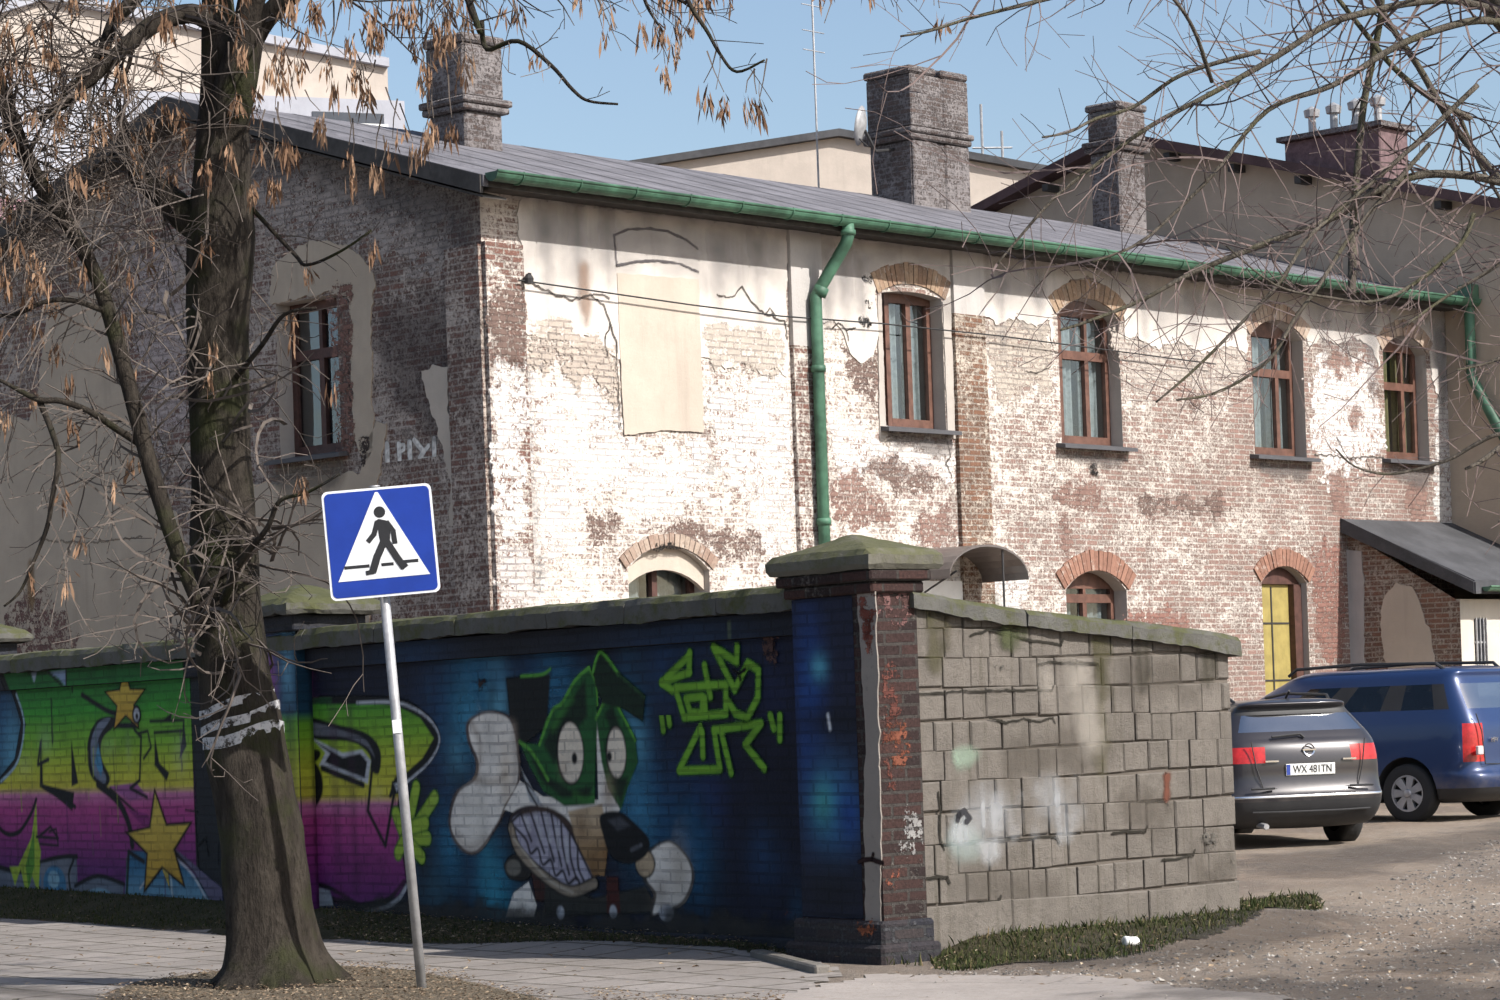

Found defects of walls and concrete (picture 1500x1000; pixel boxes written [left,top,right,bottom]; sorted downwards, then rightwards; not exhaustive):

flaking render [482,198,790,435]
flaking render [983,255,1448,433]
flaking render [253,240,387,596]
flaking render [421,364,453,526]
spalling [577,508,622,551]
spalling [641,506,766,570]
spalling [830,451,956,548]
spalling [1052,478,1112,558]
spalling [1137,488,1232,524]